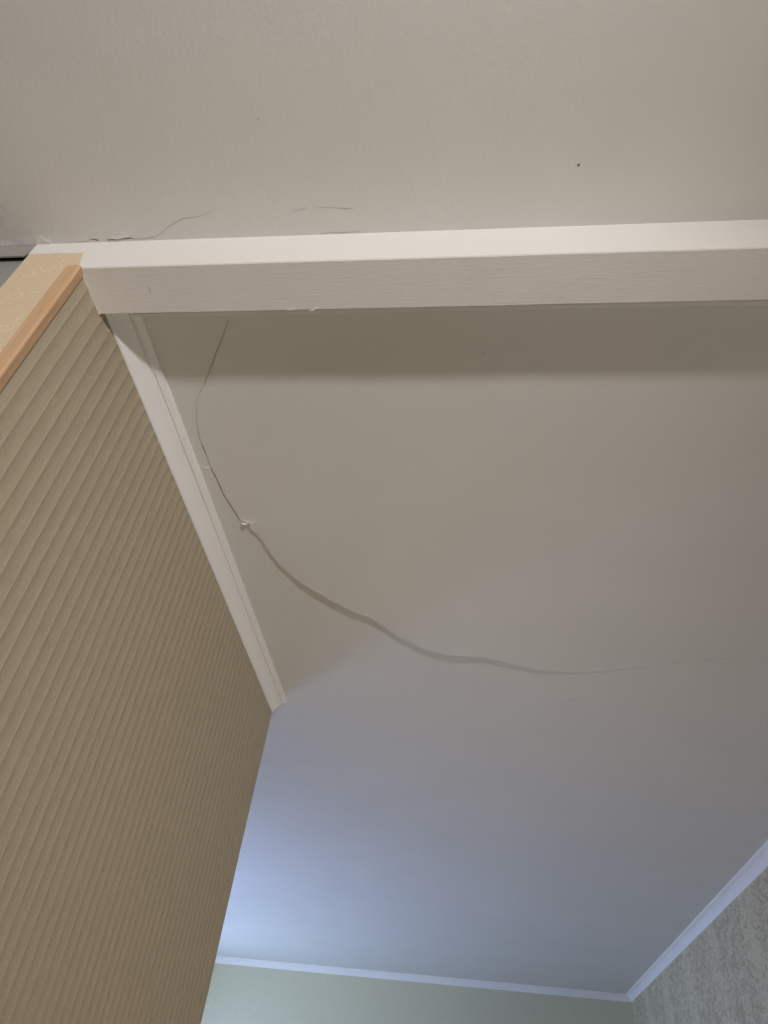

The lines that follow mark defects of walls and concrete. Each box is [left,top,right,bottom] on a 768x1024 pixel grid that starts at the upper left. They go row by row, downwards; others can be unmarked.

crack [196,320,739,673]